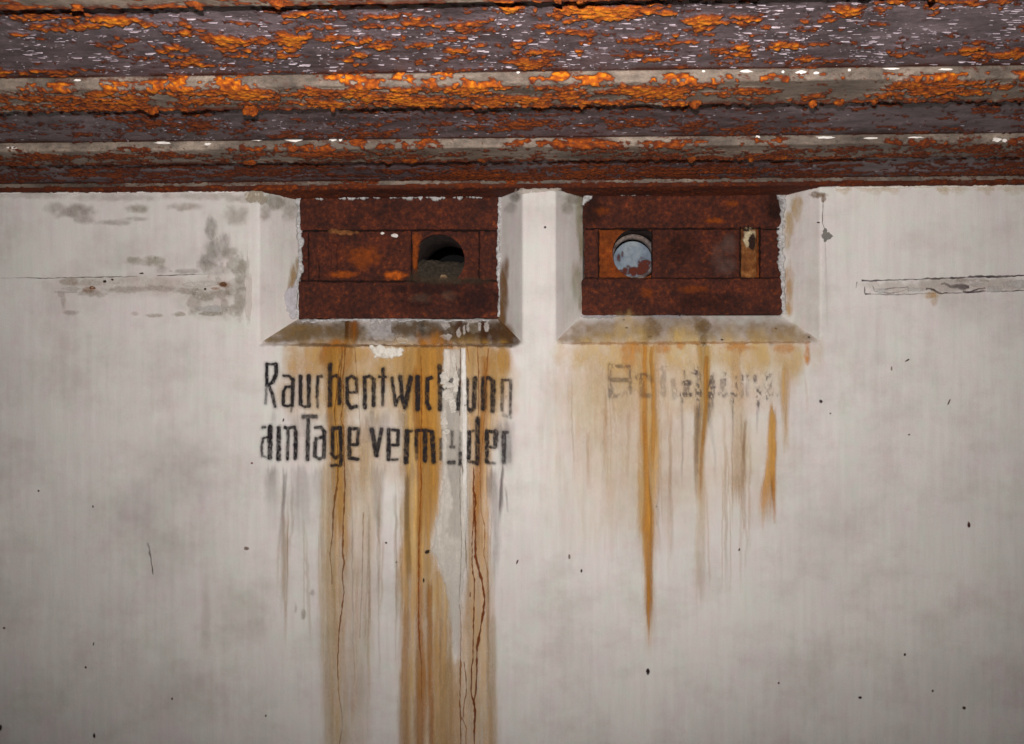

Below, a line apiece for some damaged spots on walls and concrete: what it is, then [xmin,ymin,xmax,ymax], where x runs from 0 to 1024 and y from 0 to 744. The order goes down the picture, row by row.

peeling [3,6,365,75]
peeling [373,0,1024,72]
corrosion [617,252,651,276]
crack [330,348,356,669]
corrosion [289,262,518,744]
crack [459,436,485,744]
corrosion [588,320,711,625]
corrosion [763,407,776,506]